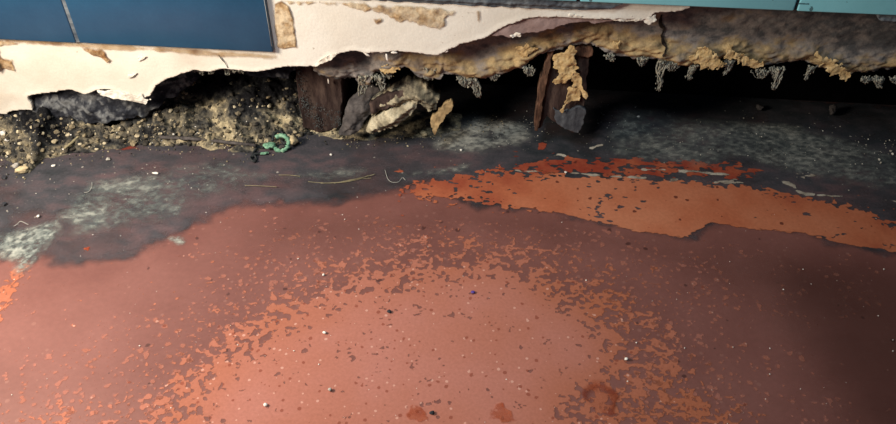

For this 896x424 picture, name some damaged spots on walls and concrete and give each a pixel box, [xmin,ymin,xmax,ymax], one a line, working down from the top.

peeling [275,1,296,49]
damp [347,77,393,100]
spalling [313,6,896,105]
damp [0,81,896,272]
peeling [398,142,896,252]
peeling [19,226,766,424]